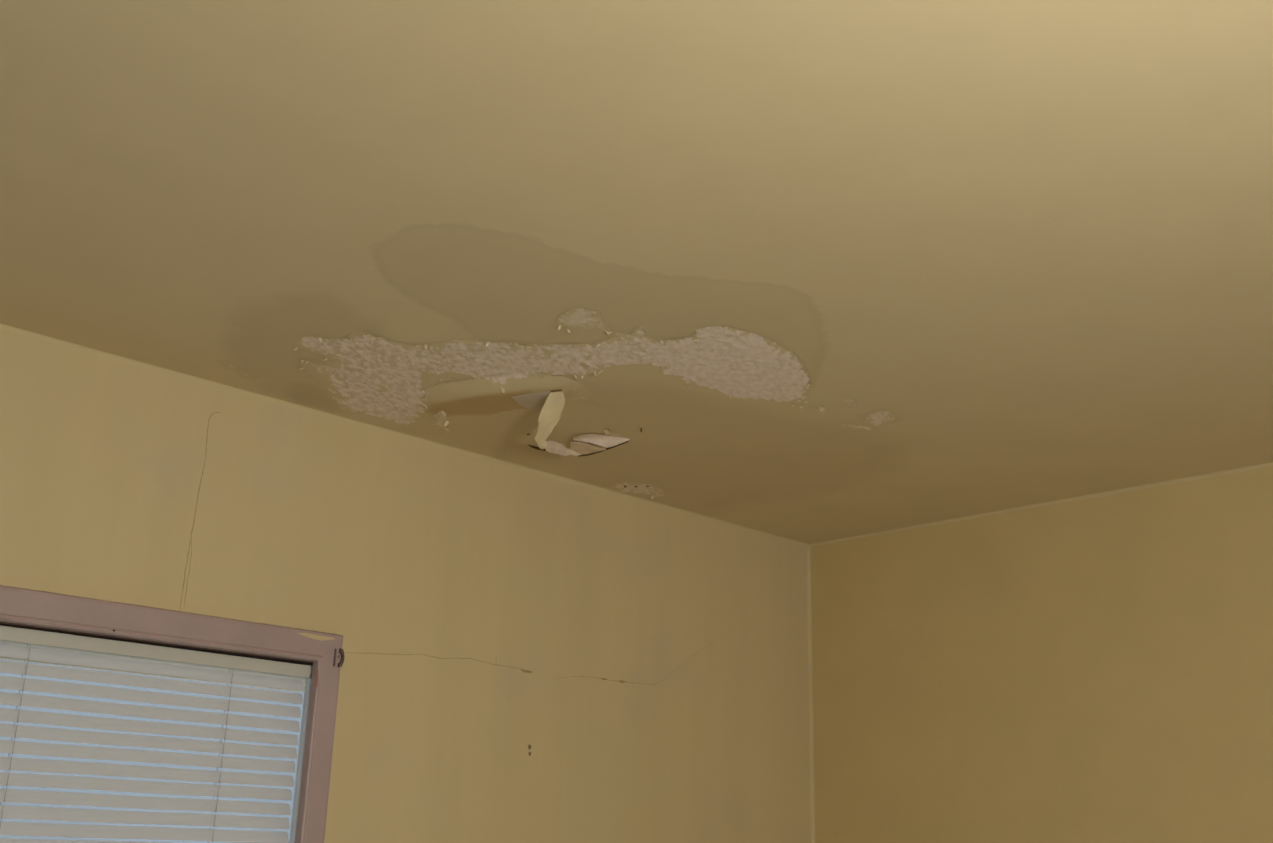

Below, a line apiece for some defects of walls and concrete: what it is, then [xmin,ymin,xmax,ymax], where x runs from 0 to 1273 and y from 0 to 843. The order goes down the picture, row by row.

peeling [292,306,812,432]
crack [180,412,221,609]
crack [345,630,730,685]